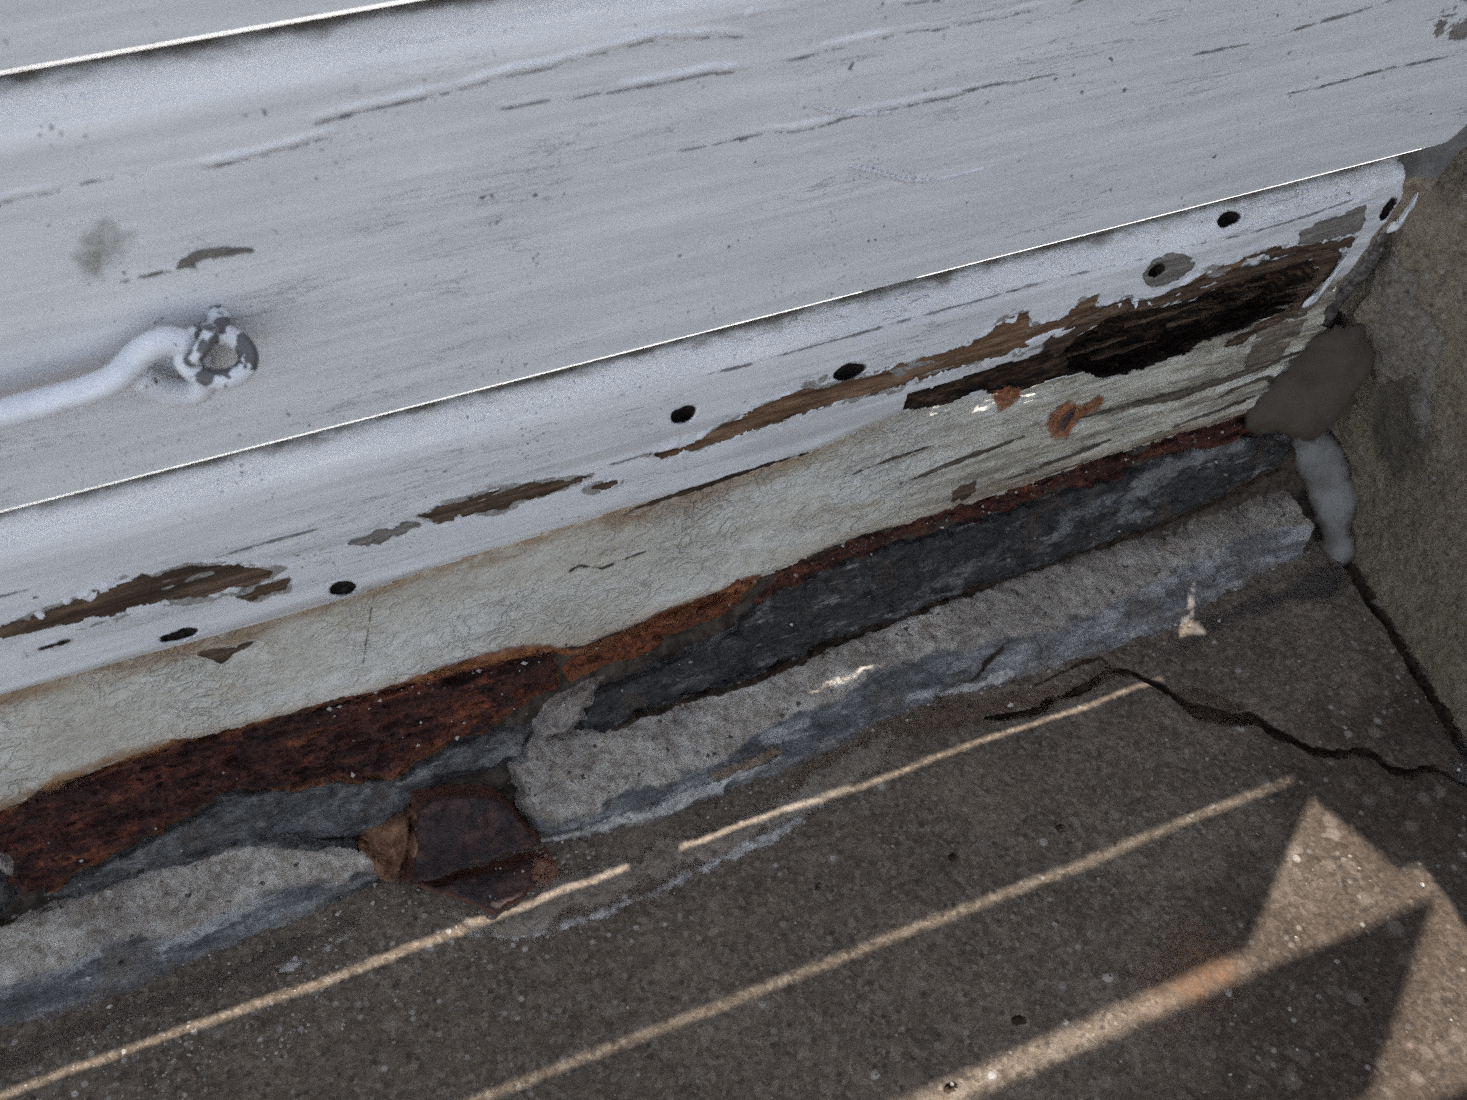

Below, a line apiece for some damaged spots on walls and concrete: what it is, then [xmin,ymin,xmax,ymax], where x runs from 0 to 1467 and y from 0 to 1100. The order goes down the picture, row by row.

peeling [1433,0,1467,41]
peeling [1387,193,1418,233]
spalling [124,246,254,283]
spalling [639,205,1367,466]
rust [1047,395,1104,439]
peeling [348,473,624,547]
peeling [0,556,292,650]
peeling [198,642,253,664]
rust [0,412,1253,894]
crack [965,641,1010,683]
crack [984,530,1467,786]